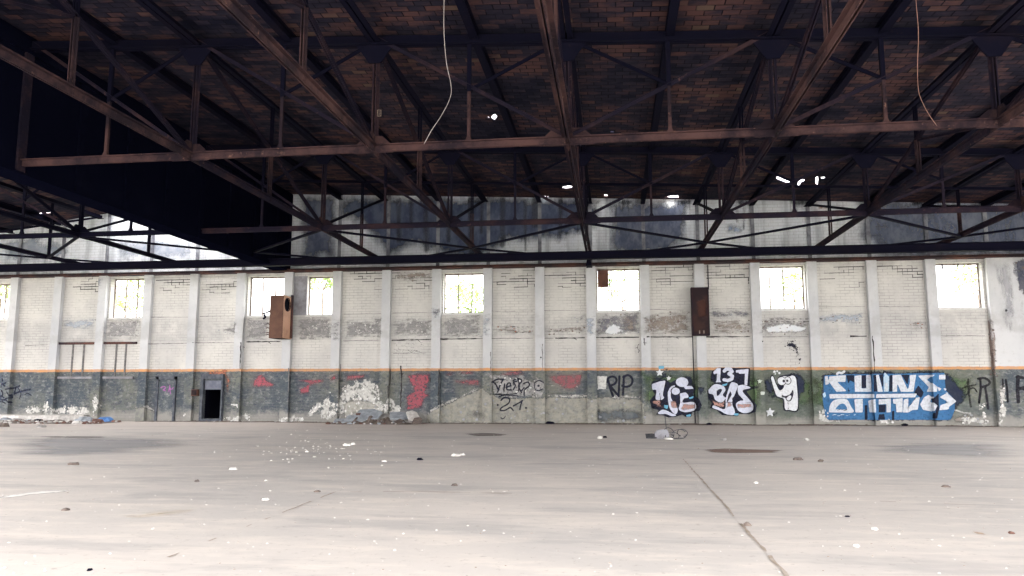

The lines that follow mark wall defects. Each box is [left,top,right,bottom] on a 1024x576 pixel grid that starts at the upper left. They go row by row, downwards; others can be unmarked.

leakage [302,197,599,257]
leakage [612,201,687,250]
leakage [861,202,1024,256]
peeling [24,395,102,417]
peeling [279,379,401,422]
crack [683,459,789,576]